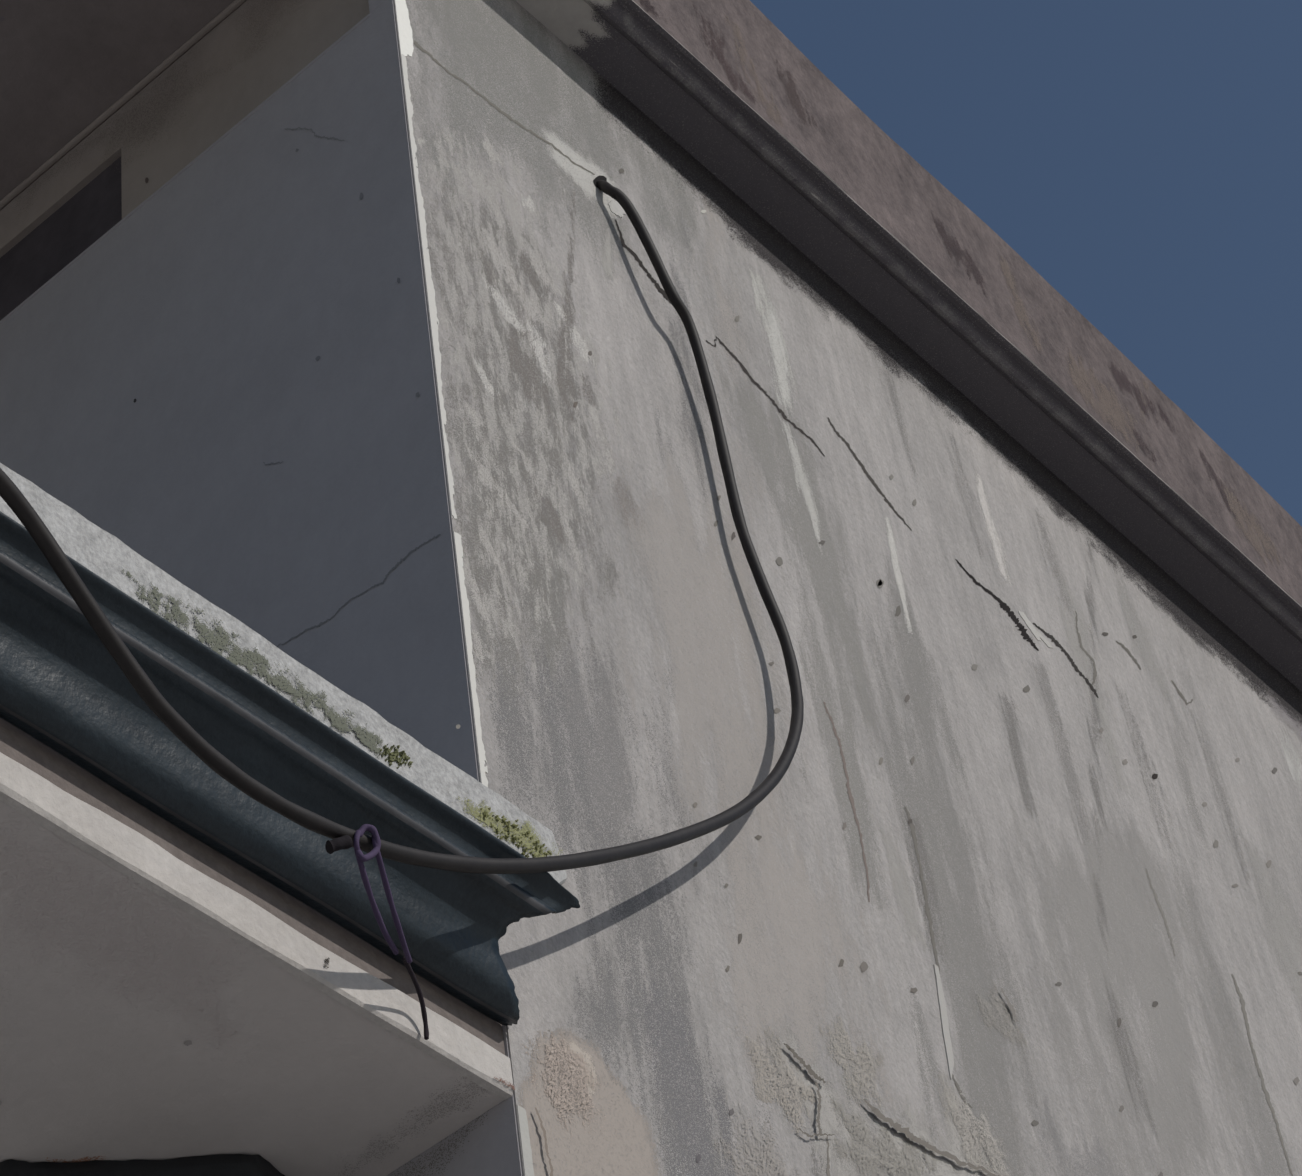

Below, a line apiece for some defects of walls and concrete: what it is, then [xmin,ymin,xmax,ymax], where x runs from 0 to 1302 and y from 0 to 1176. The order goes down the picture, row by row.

crack [413,40,595,175]
crack [615,219,671,303]
crack [706,337,912,531]
crack [277,534,441,647]
damp [406,0,1302,1176]
crack [955,559,1141,698]
crack [1171,680,1193,705]